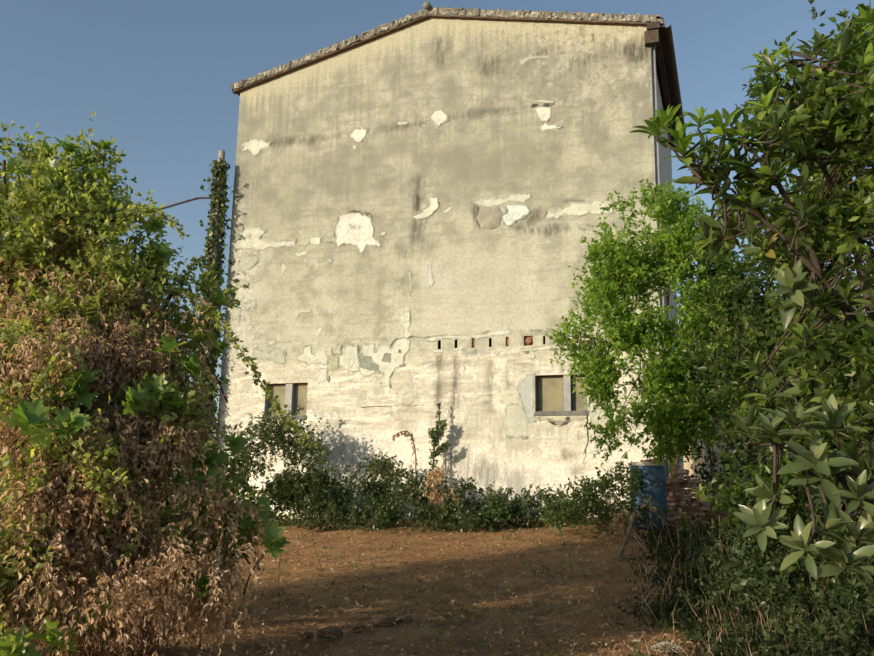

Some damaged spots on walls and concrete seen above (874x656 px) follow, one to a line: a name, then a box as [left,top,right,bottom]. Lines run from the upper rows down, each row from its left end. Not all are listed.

spalling [428,108,450,128]
spalling [530,100,562,131]
spalling [242,138,272,157]
spalling [348,125,369,150]
spalling [413,196,453,220]
spalling [475,193,613,234]
spalling [230,210,386,286]
flaking render [422,327,560,358]
flaking render [253,333,415,404]